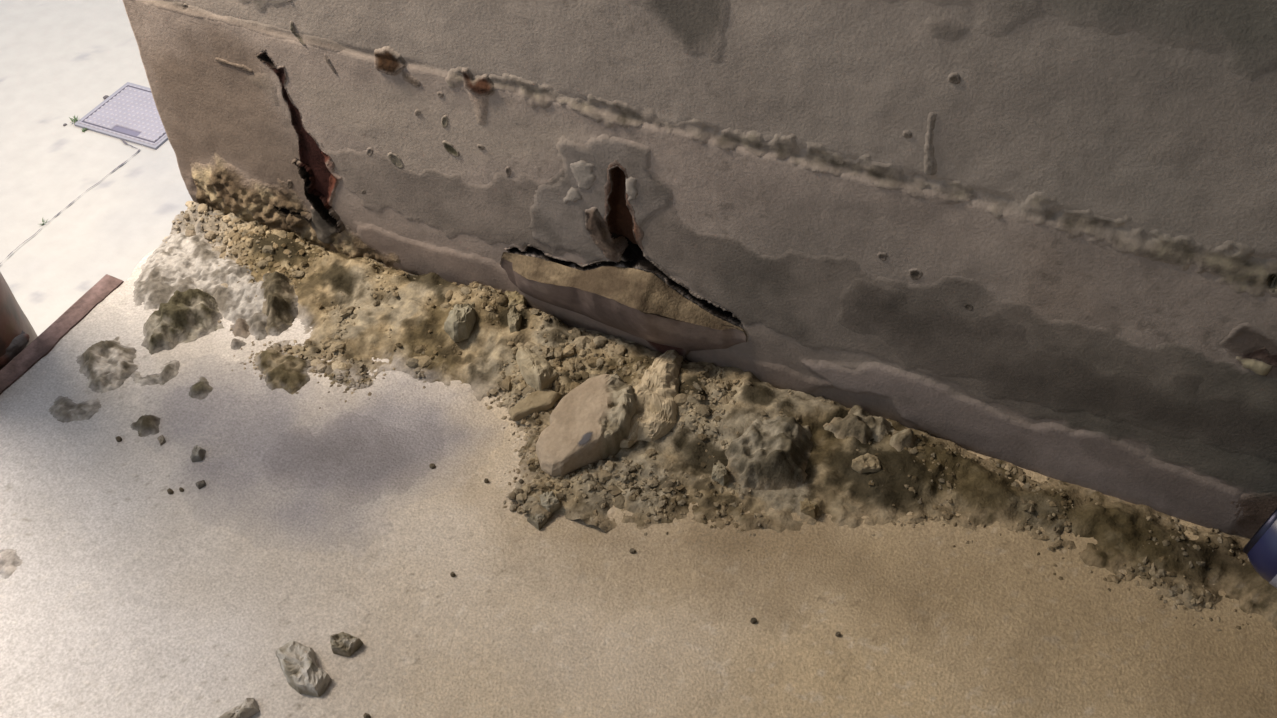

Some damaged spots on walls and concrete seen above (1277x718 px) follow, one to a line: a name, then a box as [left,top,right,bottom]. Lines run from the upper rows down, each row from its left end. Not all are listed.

crack [215,0,345,244]
rust [374,46,421,88]
rust [461,67,494,125]
water stain [626,0,731,64]
spalling [189,153,401,270]
water stain [318,139,656,351]
spalling [585,159,644,262]
crack [505,230,743,329]
spalling [909,268,923,280]
water stain [642,168,1277,535]
peeling [1219,323,1277,378]
water stain [139,354,509,558]